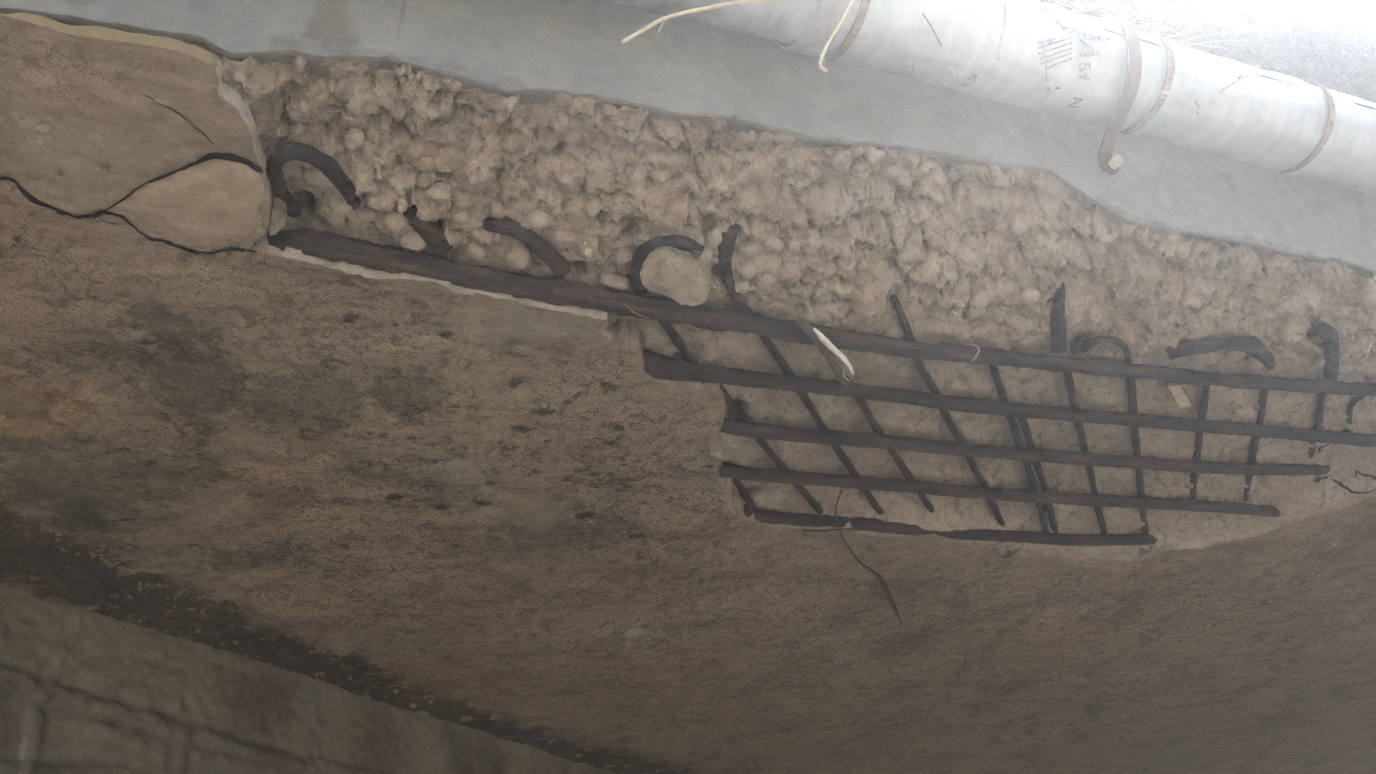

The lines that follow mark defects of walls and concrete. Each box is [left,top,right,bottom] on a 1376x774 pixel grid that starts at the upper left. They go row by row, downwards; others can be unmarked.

crack [0,94,263,254]
spalling [192,44,1376,562]
leakage [0,503,691,774]